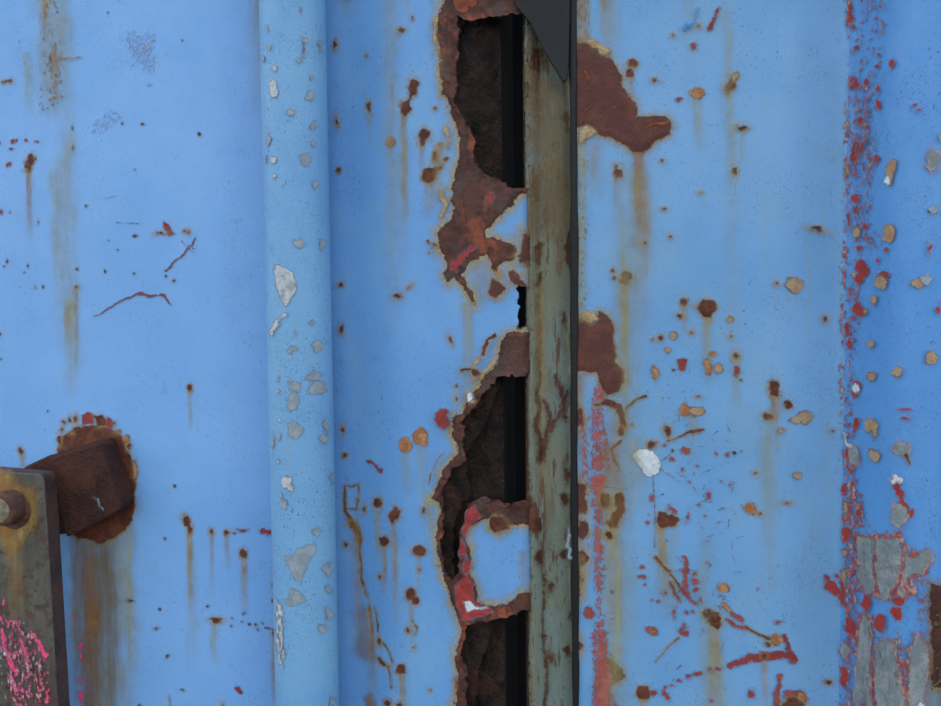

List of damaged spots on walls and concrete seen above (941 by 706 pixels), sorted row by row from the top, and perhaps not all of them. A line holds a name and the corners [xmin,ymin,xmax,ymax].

corrosion [418,125,450,218]
corrosion [562,0,674,471]
peeling [268,264,297,336]
peeling [775,277,804,294]
corrosion [487,17,584,706]
peeling [823,0,935,706]
peeling [270,370,327,448]
peeling [776,399,814,435]
corrosion [57,411,138,544]
peeling [284,528,320,606]
corrosion [926,581,941,690]
corrosion [773,674,810,706]